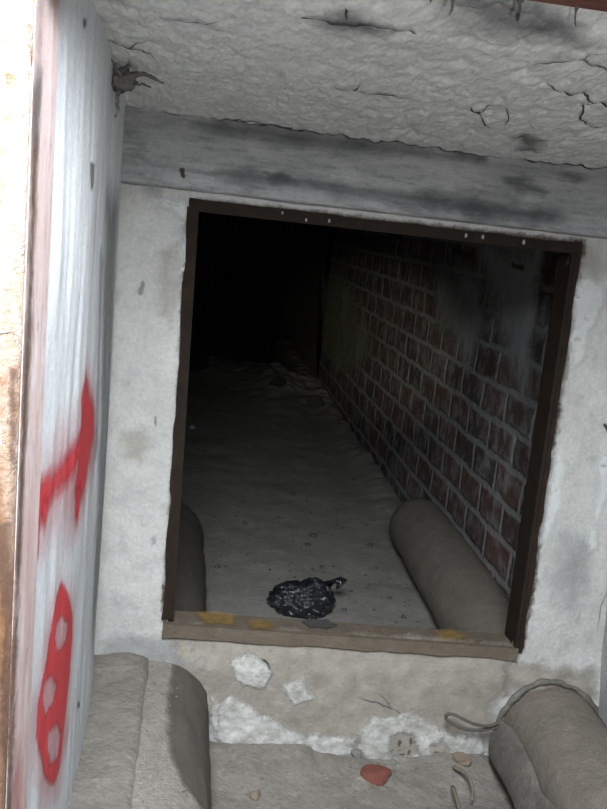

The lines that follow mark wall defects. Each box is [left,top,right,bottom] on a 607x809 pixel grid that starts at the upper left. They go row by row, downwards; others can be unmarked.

crack [301,8,416,34]
crack [470,105,509,129]
crack [533,54,607,128]
corrosion [0,77,41,809]
flaking render [171,638,513,760]